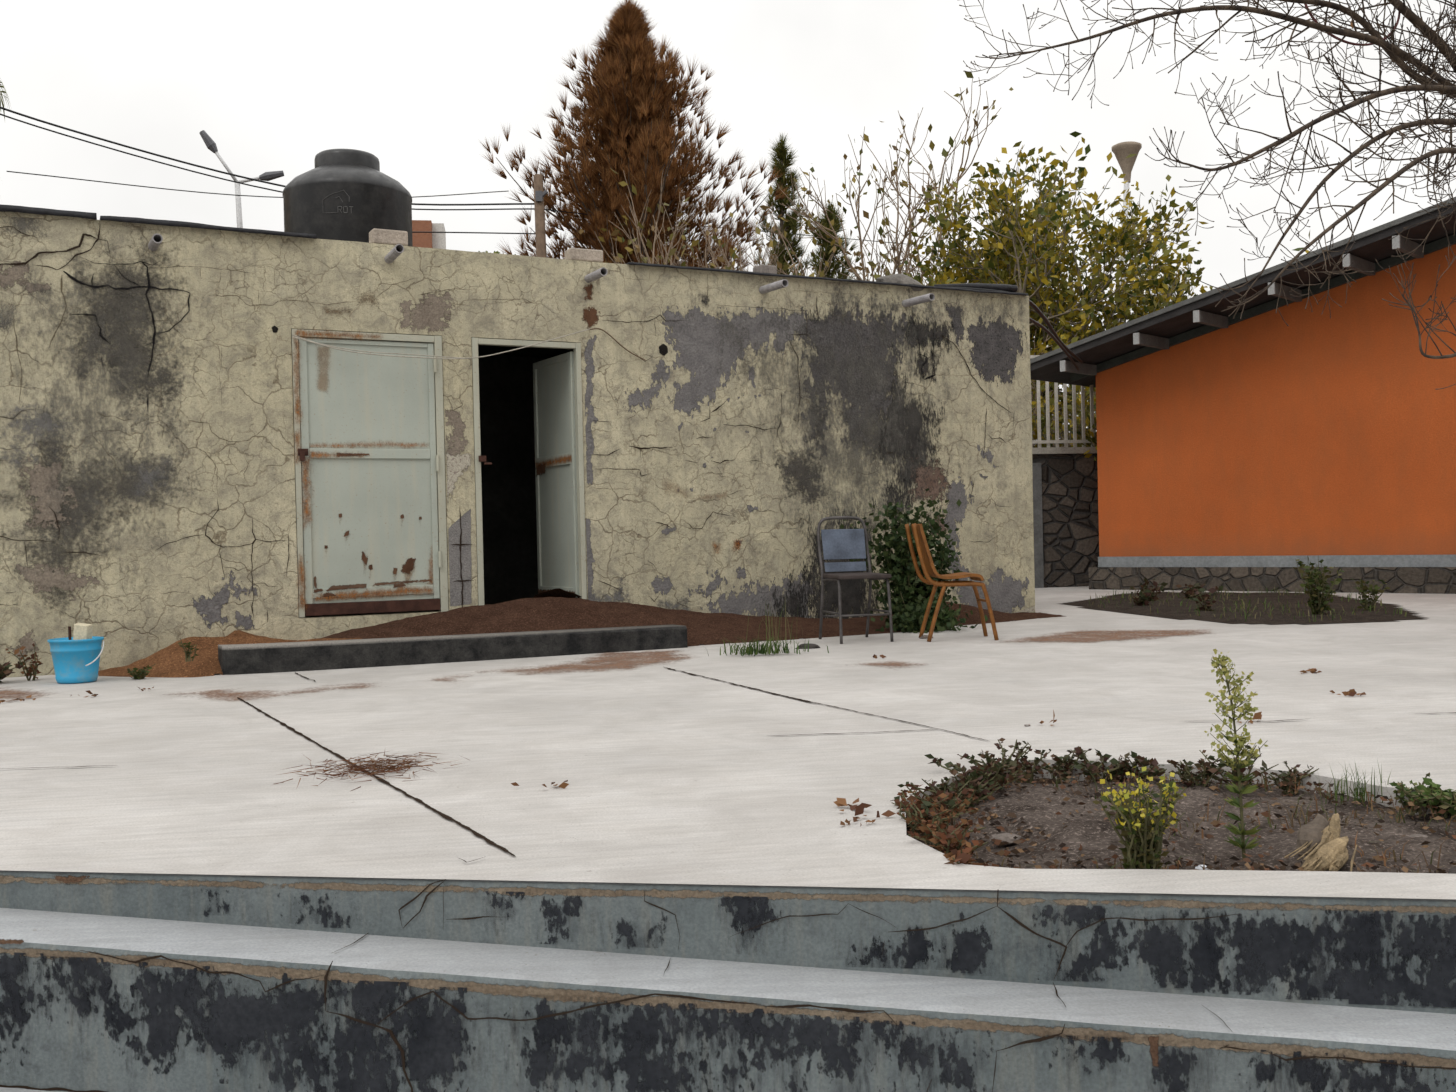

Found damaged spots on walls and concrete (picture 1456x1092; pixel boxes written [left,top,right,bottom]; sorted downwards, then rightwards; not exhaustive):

peeling [400,290,455,334]
crack [0,226,538,623]
rust [294,330,427,523]
crack [589,279,883,551]
damp [765,293,1022,619]
crack [919,335,1015,542]
peeling [191,570,257,630]
rust [299,552,433,607]
damp [0,952,476,1092]
damp [504,997,992,1092]
damp [848,913,992,974]
damp [1032,904,1456,1007]